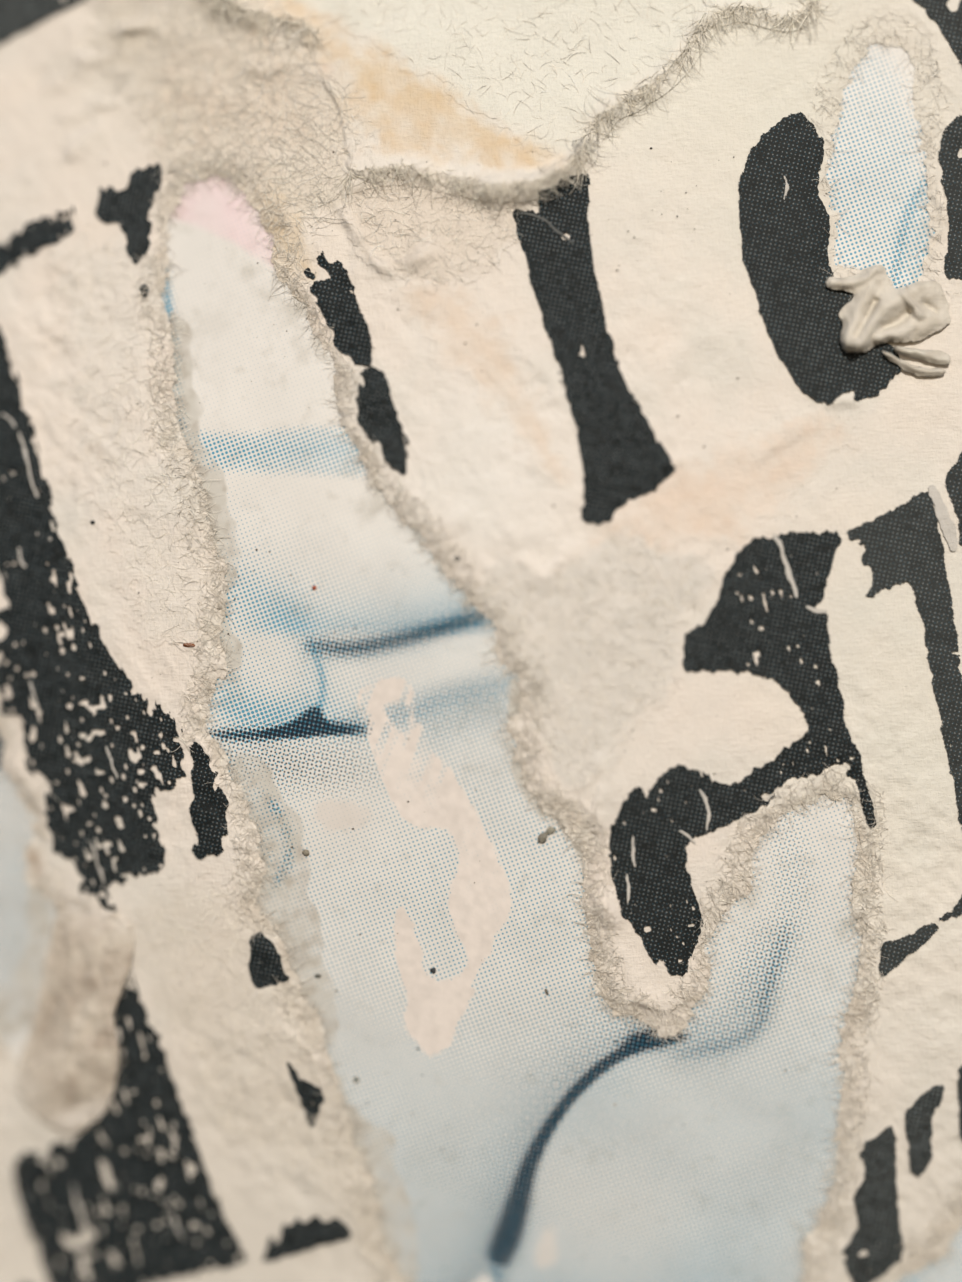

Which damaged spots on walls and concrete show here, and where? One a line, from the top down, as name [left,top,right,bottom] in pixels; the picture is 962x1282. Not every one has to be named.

peeling [76,0,708,297]
peeling [356,676,513,1057]
peeling [15,868,395,1266]